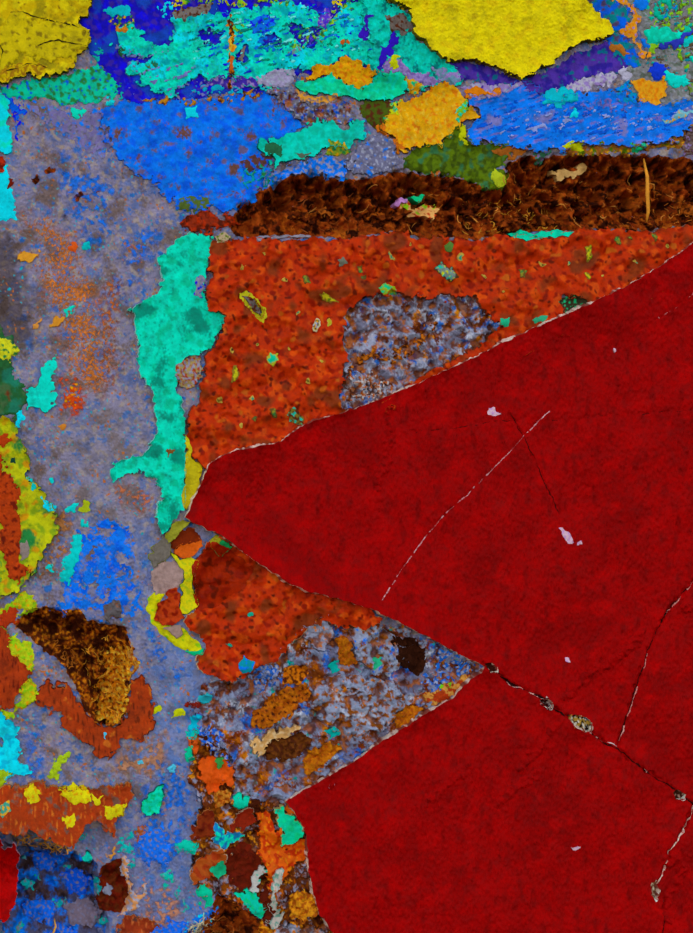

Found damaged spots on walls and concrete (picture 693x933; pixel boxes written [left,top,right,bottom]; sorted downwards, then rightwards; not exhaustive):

crack [416,415,559,513]
crack [497,580,693,884]